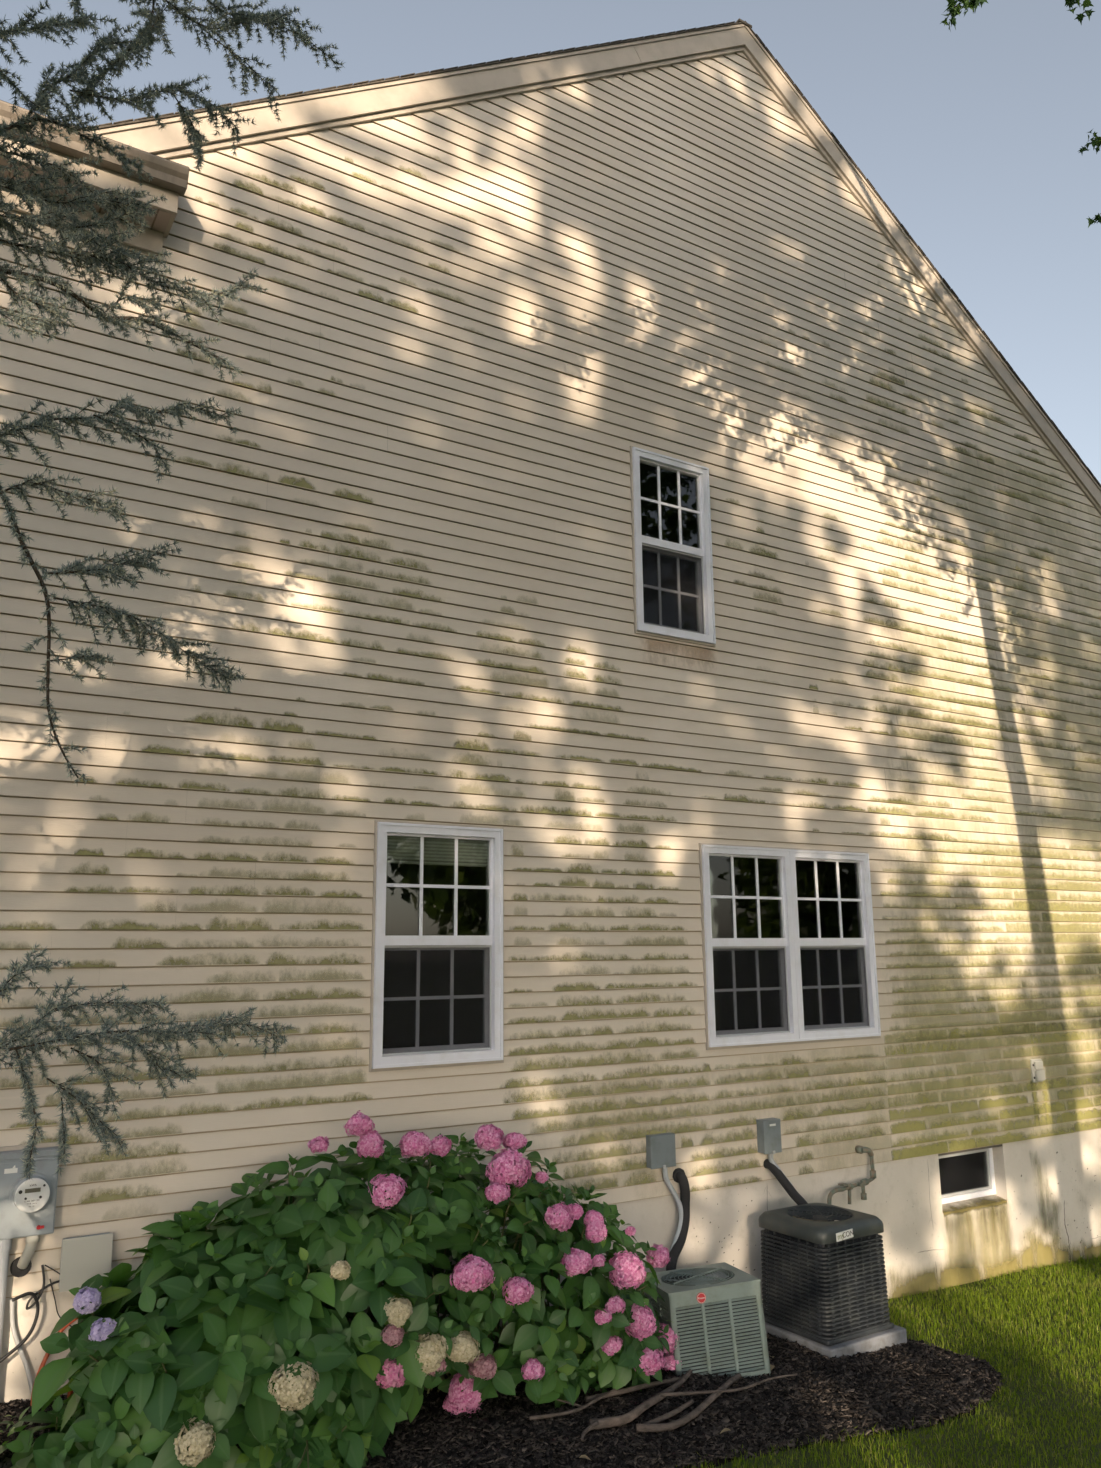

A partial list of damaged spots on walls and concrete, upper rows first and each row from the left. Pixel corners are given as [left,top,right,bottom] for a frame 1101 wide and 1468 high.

leakage [883,1235,1101,1300]